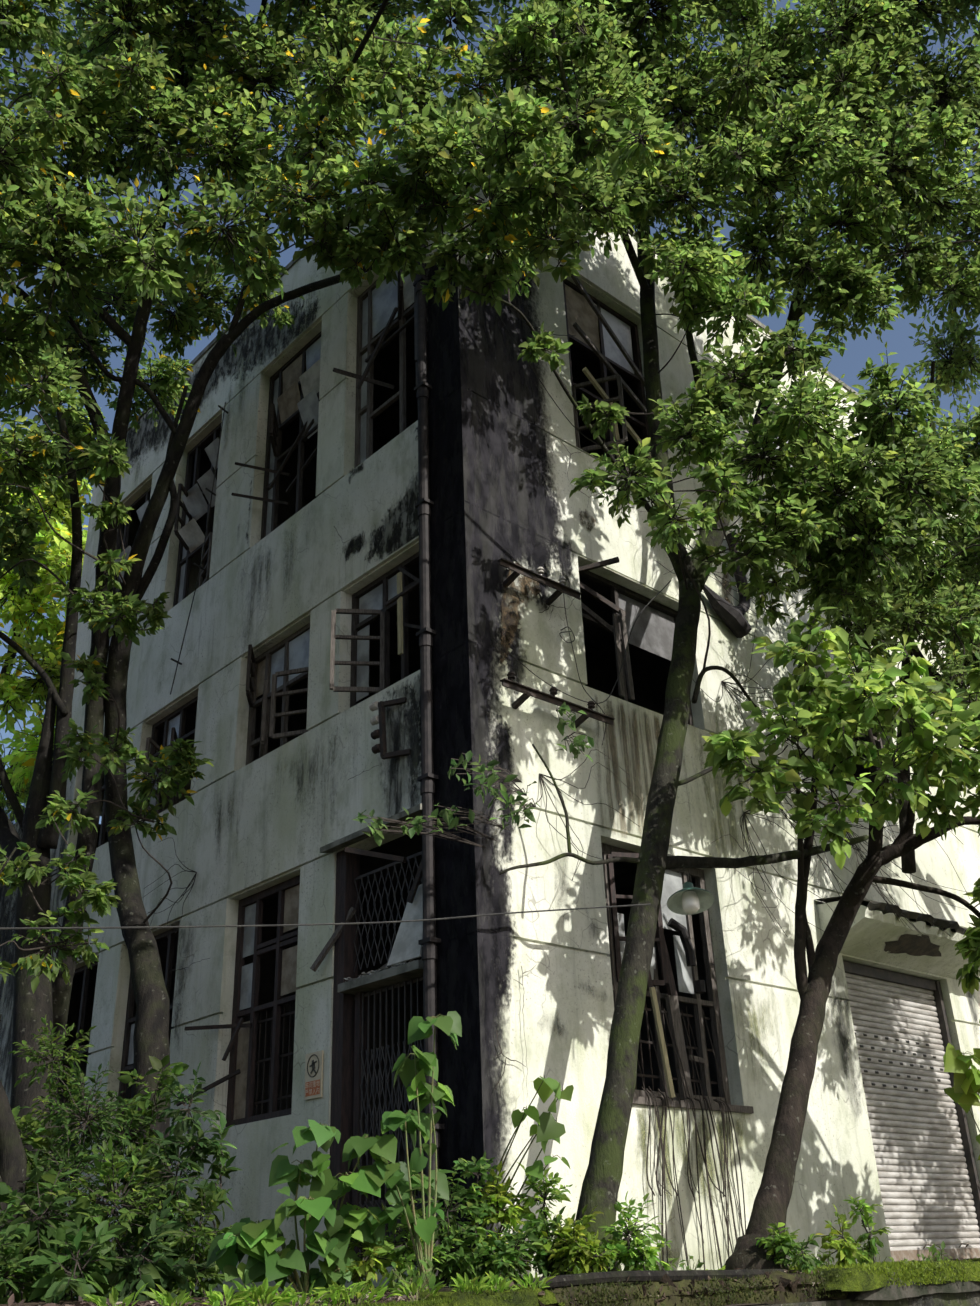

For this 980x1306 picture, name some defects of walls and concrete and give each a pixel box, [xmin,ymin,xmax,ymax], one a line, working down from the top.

damp [125,298,319,473]
damp [344,412,433,561]
damp [527,535,574,611]
damp [579,510,596,531]
damp [500,603,527,694]
damp [489,723,515,1000]